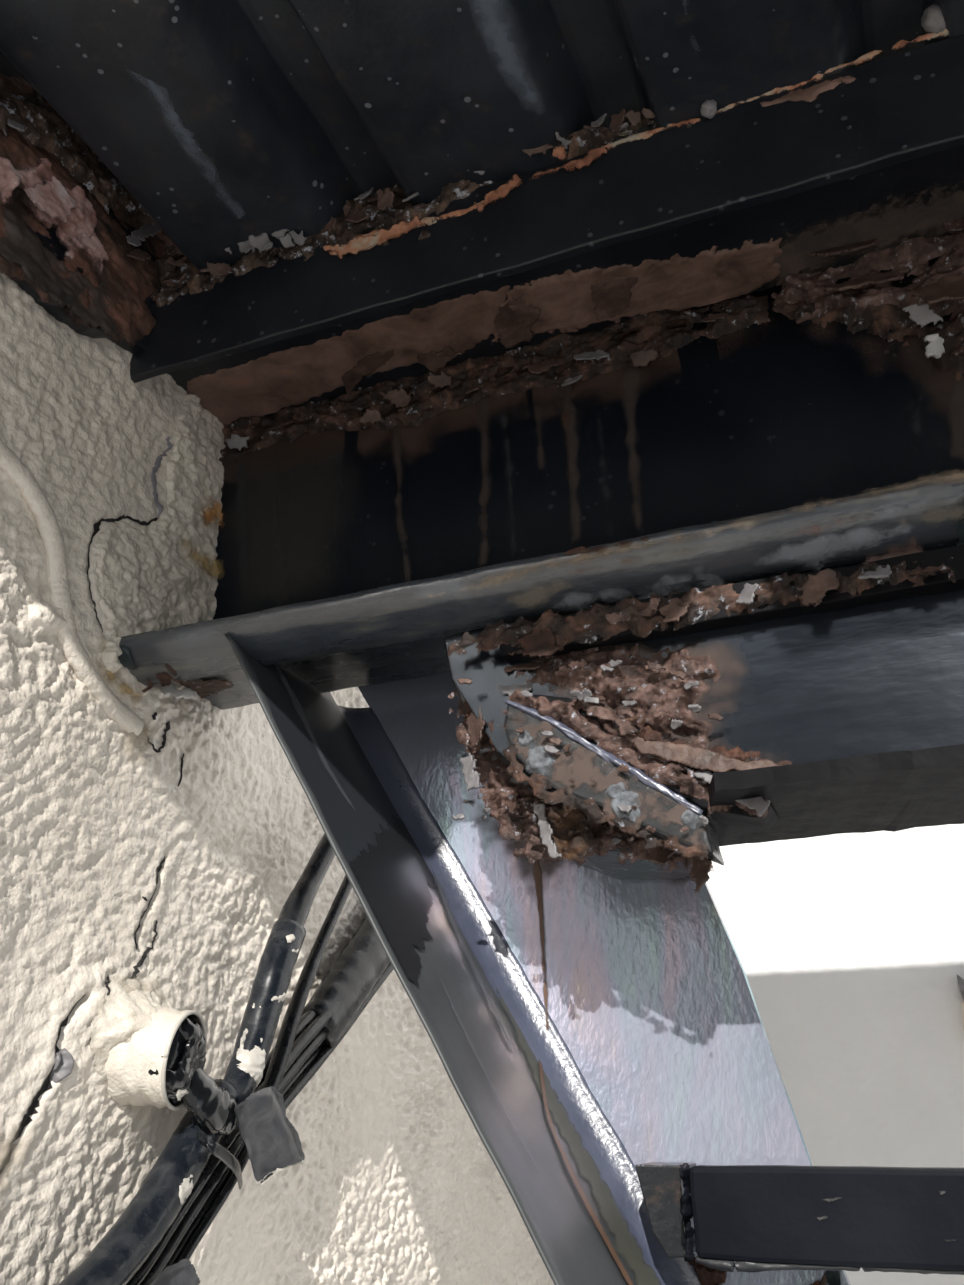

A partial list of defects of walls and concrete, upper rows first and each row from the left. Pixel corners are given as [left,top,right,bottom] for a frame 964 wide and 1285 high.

corrosion [0,73,187,346]
peeling [138,74,242,219]
peeling [472,0,539,105]
peeling [555,132,572,150]
corrosion [771,217,964,456]
crack [87,436,173,632]
corrosion [550,365,648,566]
crack [147,712,184,787]
corrosion [448,473,964,1030]
crack [0,857,165,1174]
corrosion [684,1257,727,1285]
corrosion [811,1270,841,1285]